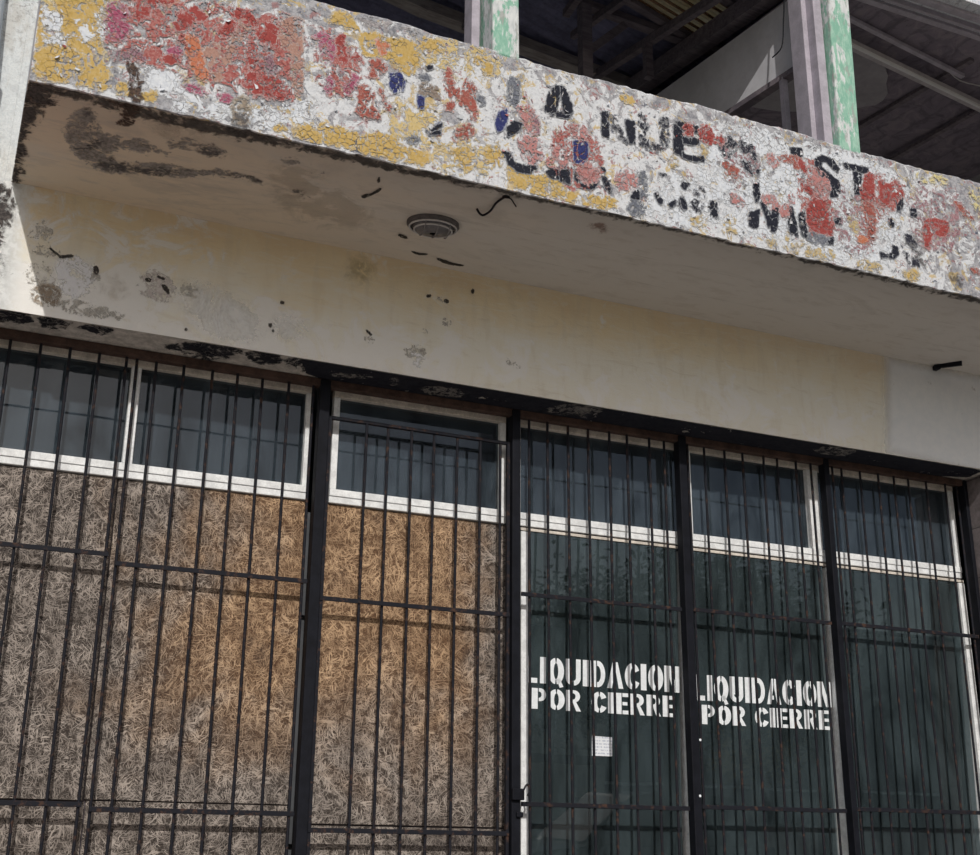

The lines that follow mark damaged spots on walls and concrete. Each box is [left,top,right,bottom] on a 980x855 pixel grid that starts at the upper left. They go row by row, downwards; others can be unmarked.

peeling [0,220,124,336]
peeling [137,269,198,303]
leakage [0,82,980,303]
peeling [31,0,980,281]